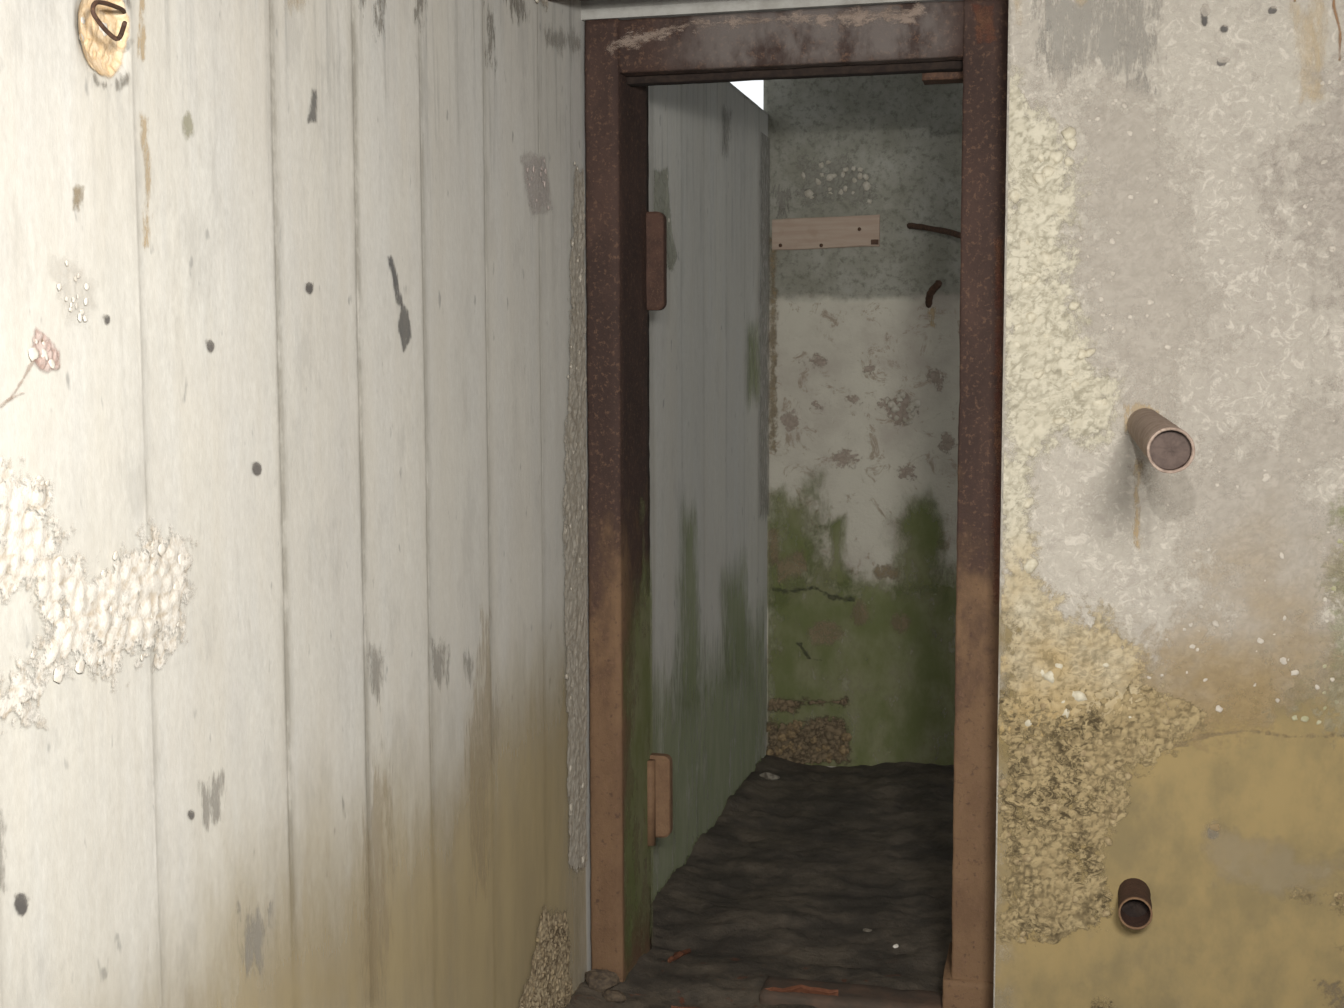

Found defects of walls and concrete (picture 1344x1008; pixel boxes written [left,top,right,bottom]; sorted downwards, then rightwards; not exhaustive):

damp [485,5,495,65]
damp [506,0,526,20]
rust [1332,0,1341,60]
damp [308,91,317,123]
spalling [995,66,1207,944]
damp [874,499,943,593]
damp [203,773,224,826]
damp [995,614,1344,1008]
damp [216,686,577,1008]